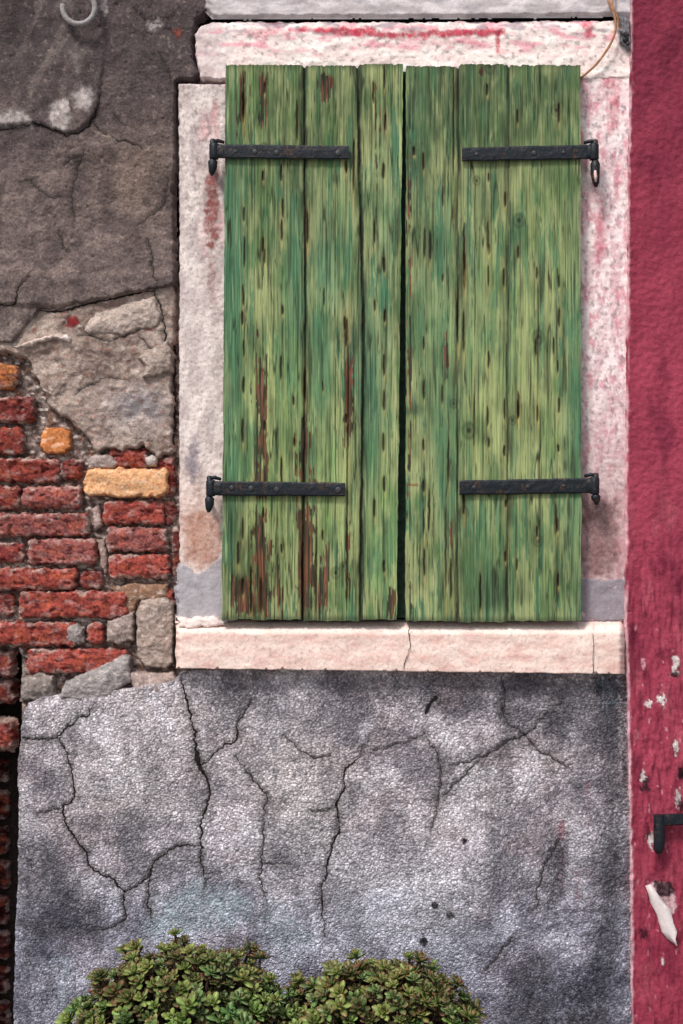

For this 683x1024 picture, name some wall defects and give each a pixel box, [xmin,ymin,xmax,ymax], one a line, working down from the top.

crack [0,95,143,250]
crack [0,180,177,445]
spalling [0,278,191,1024]
peeling [670,656,679,677]
crack [22,679,288,931]
crack [291,678,568,938]
peeling [640,771,650,791]
peeling [673,741,683,811]
peeling [645,880,677,946]